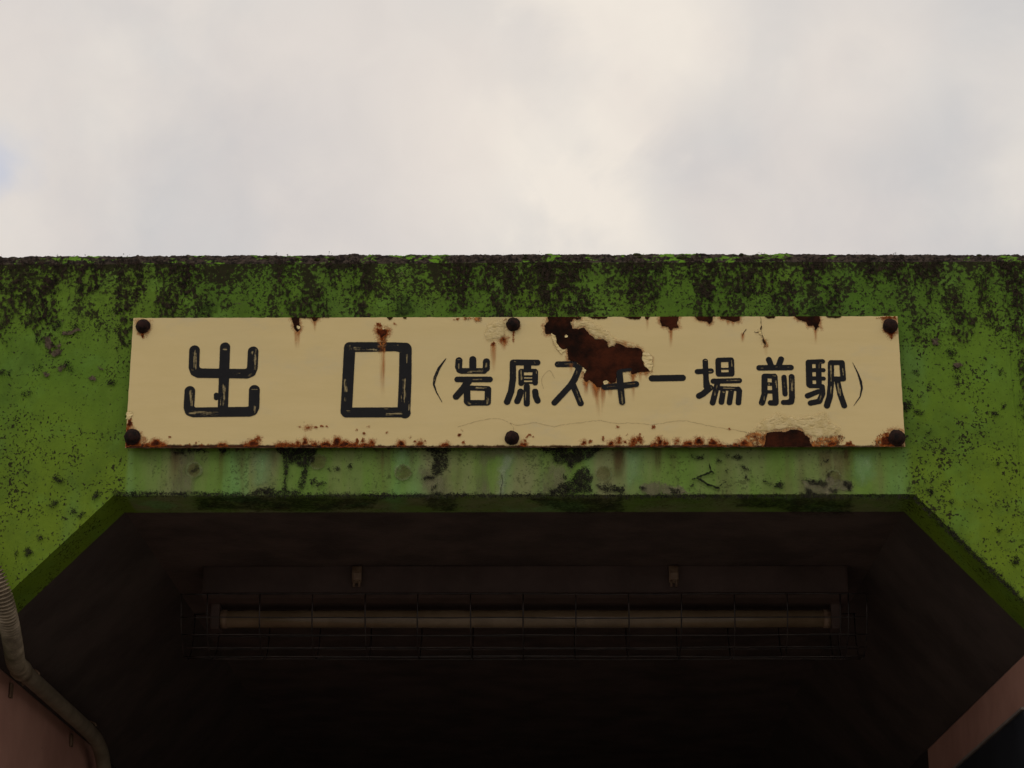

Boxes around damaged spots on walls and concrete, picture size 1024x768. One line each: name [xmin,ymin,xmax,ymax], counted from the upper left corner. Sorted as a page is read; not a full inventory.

water stain [0,253,204,354]
water stain [274,251,378,317]
water stain [437,253,593,317]
water stain [617,254,668,316]
water stain [685,253,845,317]
crack [692,464,726,489]
water stain [111,448,1024,604]